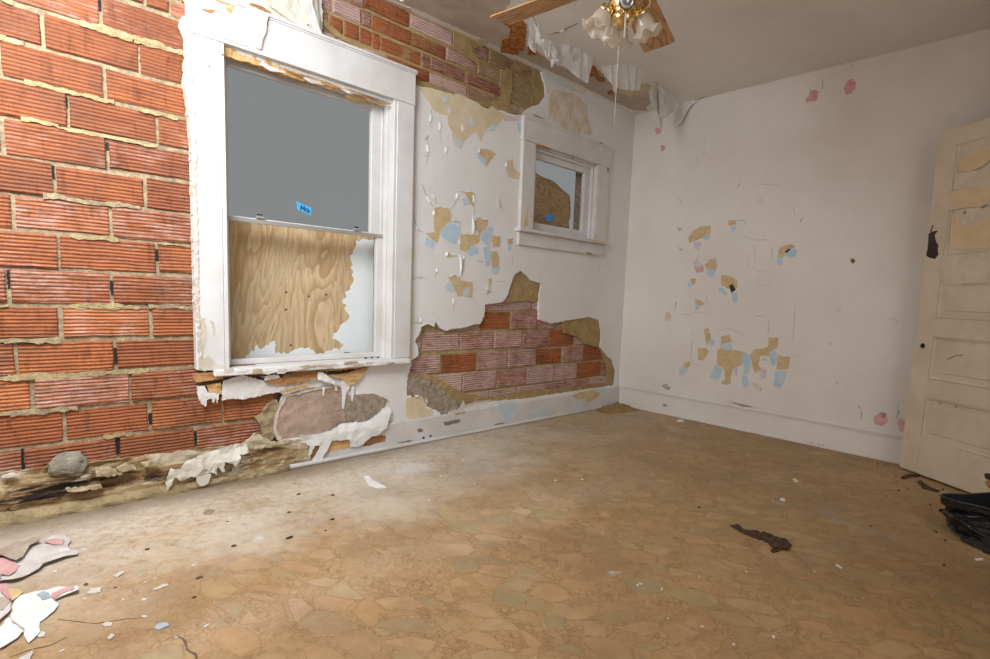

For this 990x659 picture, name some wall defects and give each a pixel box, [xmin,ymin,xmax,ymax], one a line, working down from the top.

flaking render [0,0,615,490]
peeling [677,225,739,303]
peeling [777,244,797,265]
peeling [679,328,790,391]